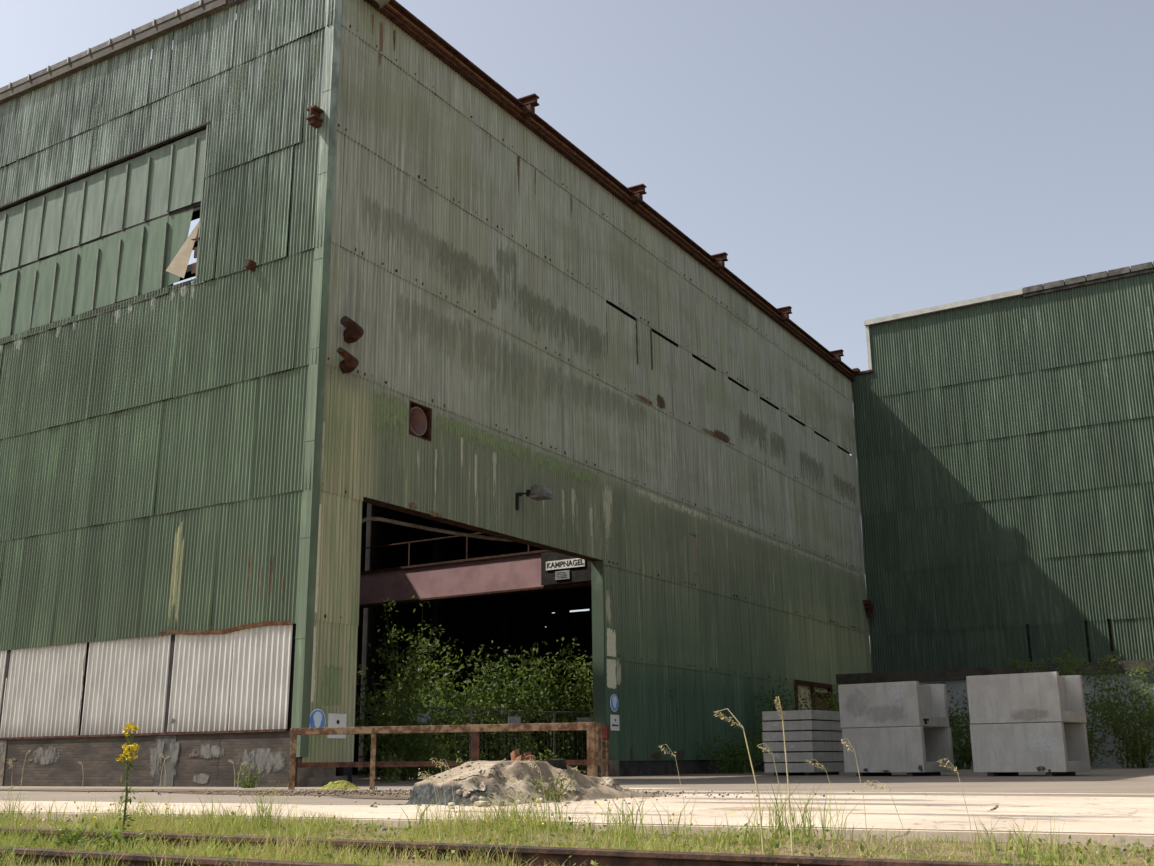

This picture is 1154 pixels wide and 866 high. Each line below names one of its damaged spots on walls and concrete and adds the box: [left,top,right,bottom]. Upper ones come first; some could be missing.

rust [372,14,396,66]
rust [636,395,665,408]
rust [702,428,729,443]